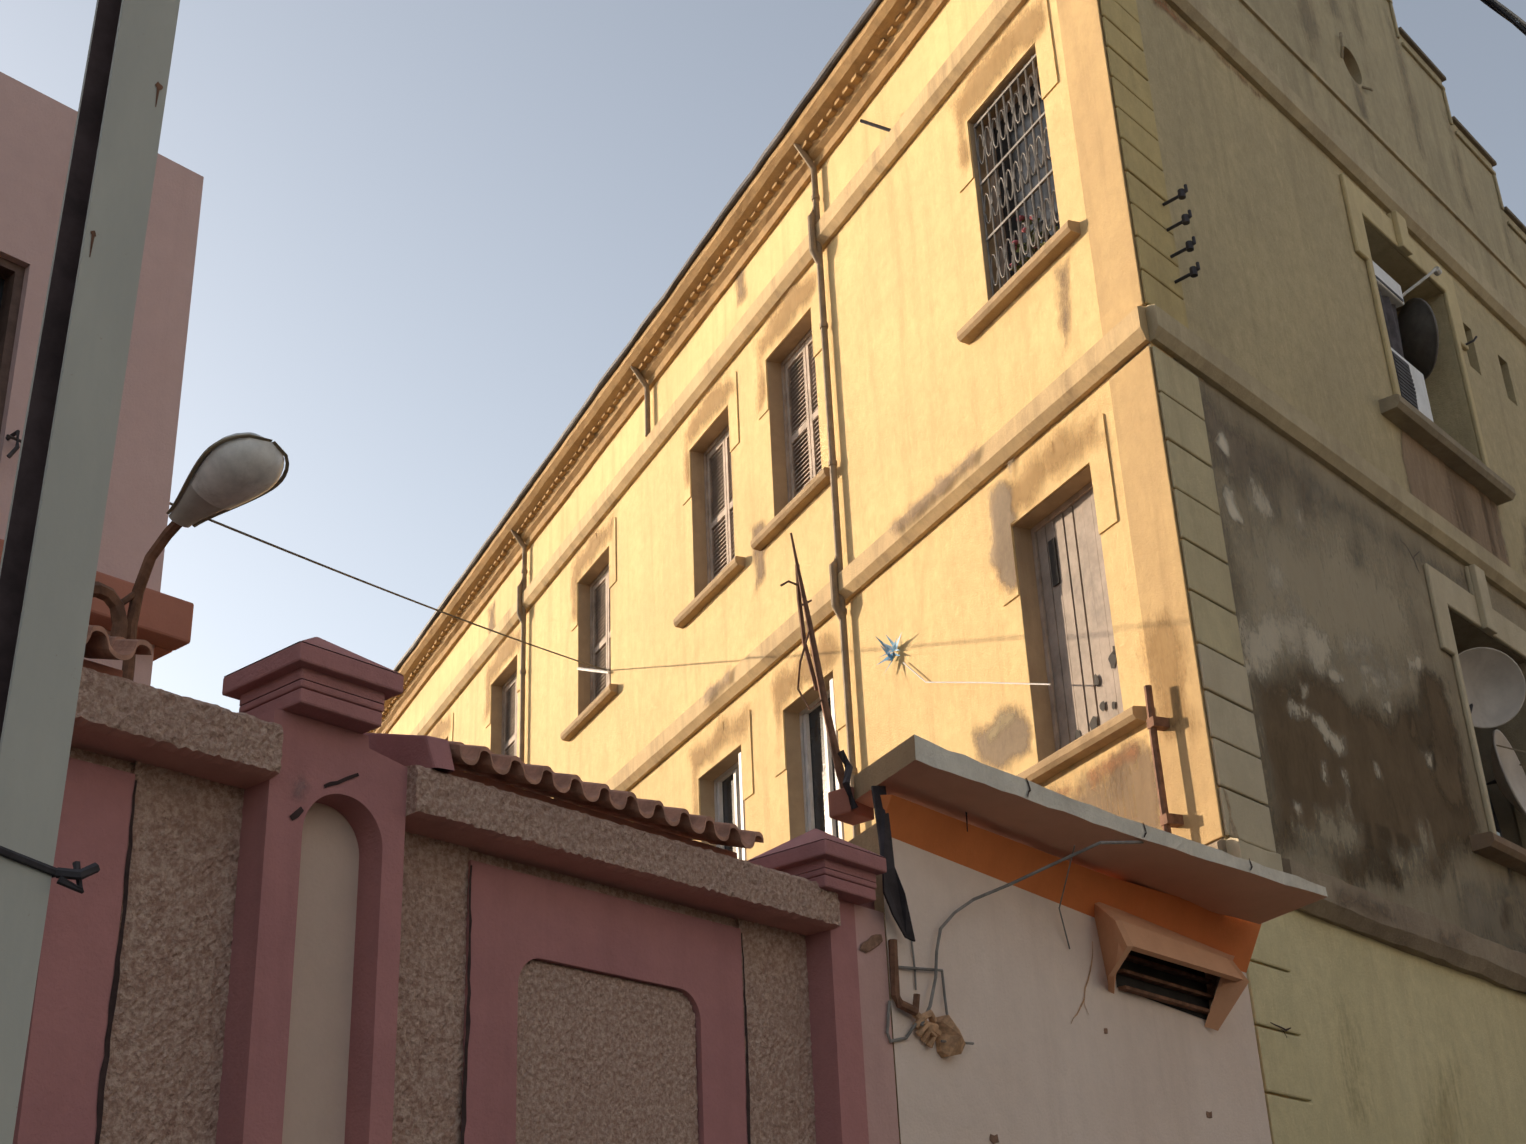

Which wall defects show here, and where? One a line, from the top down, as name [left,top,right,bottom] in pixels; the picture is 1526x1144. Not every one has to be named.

damp [892,450,974,534]
peeling [1217,433,1229,456]
peeling [1223,478,1273,523]
damp [1202,399,1374,625]
damp [1401,430,1509,566]
damp [1073,743,1161,829]
peeling [1288,686,1348,782]
damp [1243,665,1480,886]